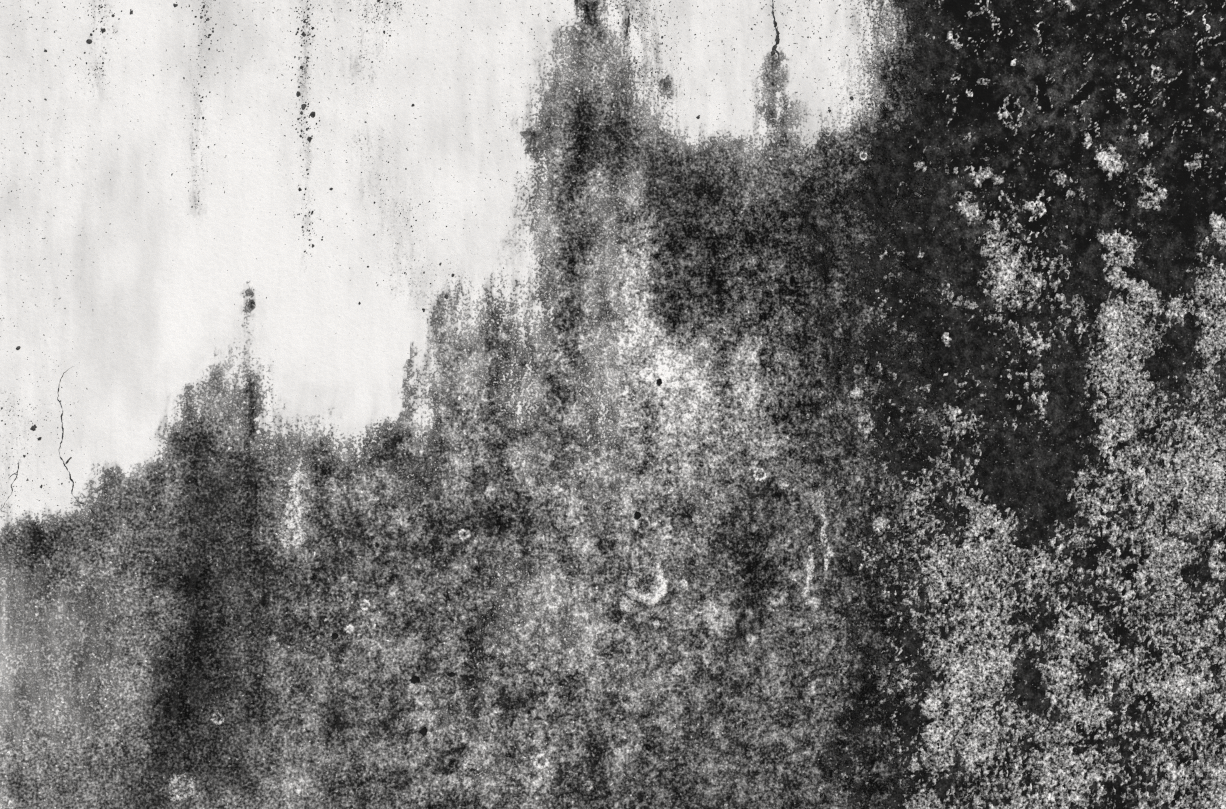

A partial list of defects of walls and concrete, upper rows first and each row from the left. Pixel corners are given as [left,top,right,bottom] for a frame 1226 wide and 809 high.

damp [64,0,133,83]
damp [347,0,428,78]
crack [771,3,780,60]
damp [183,0,221,213]
damp [285,0,338,253]
damp [242,281,256,326]
crack [57,368,98,517]